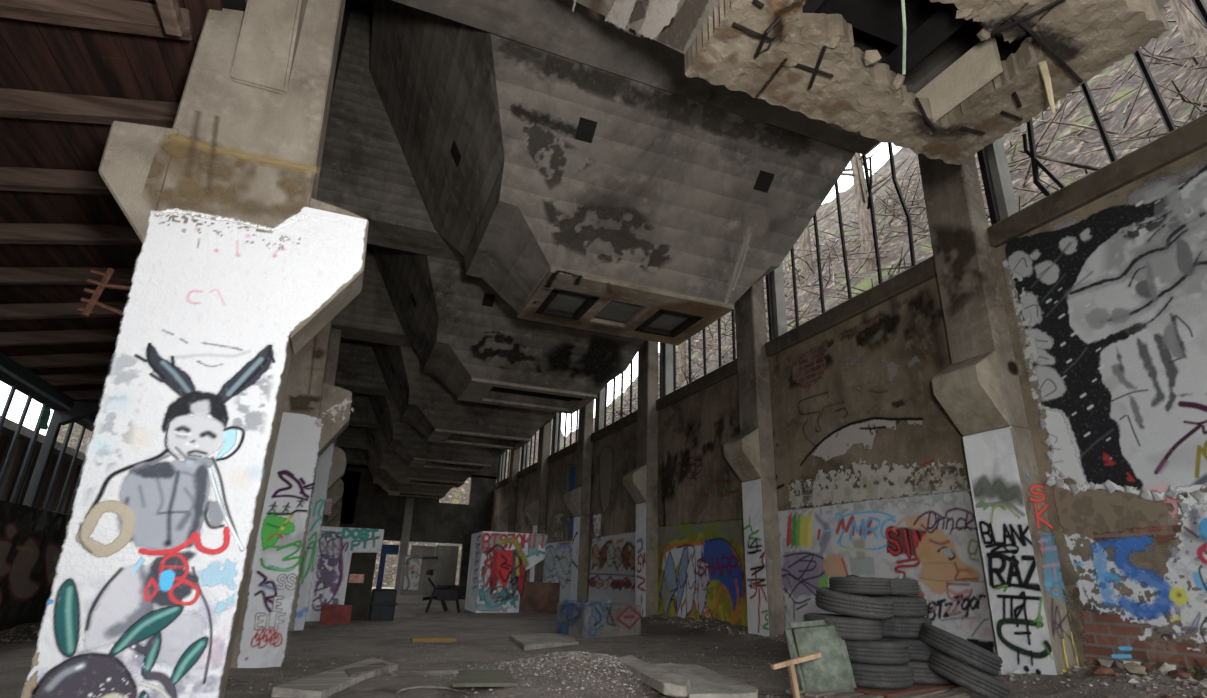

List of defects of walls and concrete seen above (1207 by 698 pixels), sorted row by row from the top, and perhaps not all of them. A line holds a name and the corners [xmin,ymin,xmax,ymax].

leakage [511,105,577,187]
leakage [505,40,809,156]
spalling [719,0,841,107]
spalling [863,50,882,66]
spalling [890,73,905,93]
spalling [906,84,1030,156]
spalling [956,0,1083,84]
leakage [545,202,669,269]
leakage [471,332,541,372]
peeling [787,398,971,509]
peeling [1003,266,1207,683]